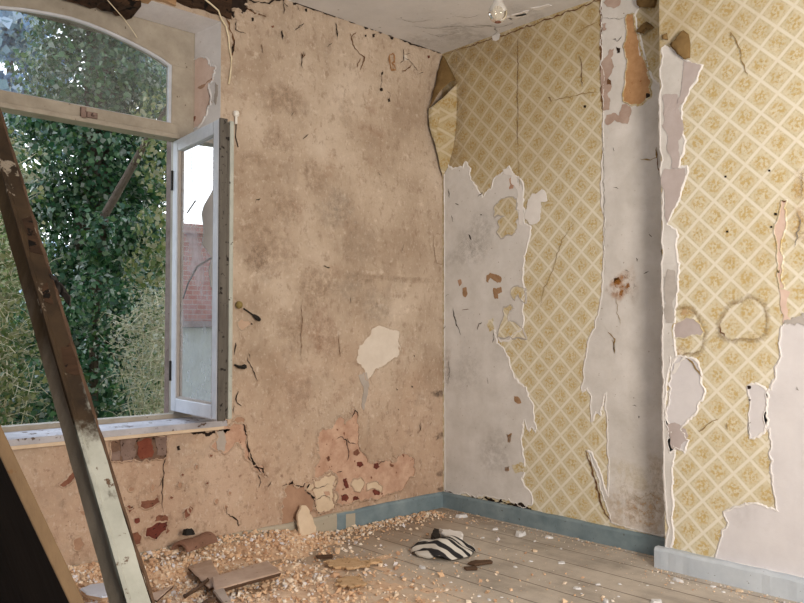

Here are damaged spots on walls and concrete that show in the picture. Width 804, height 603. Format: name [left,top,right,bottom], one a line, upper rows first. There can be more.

peeling [193,56,218,130]
peeling [661,61,701,223]
peeling [503,168,547,225]
peeling [664,269,677,323]
flaking render [108,435,181,464]
flaking render [278,324,416,525]
peeling [667,423,688,450]
flaking render [471,495,531,509]